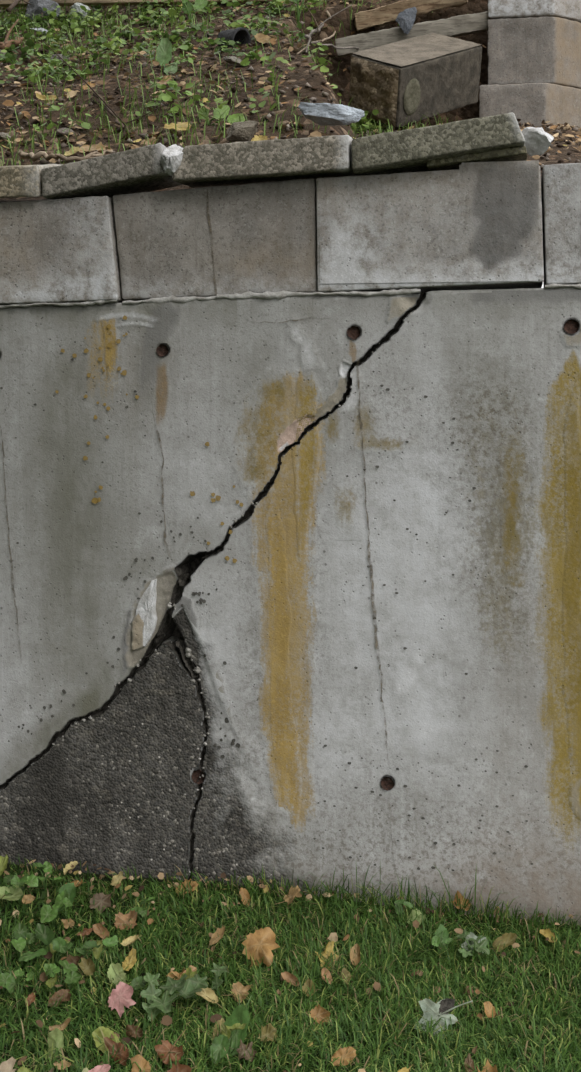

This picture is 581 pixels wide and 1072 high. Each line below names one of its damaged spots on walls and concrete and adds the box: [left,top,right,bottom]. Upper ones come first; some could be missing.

spalling [0,563,339,899]
crack [0,291,426,880]